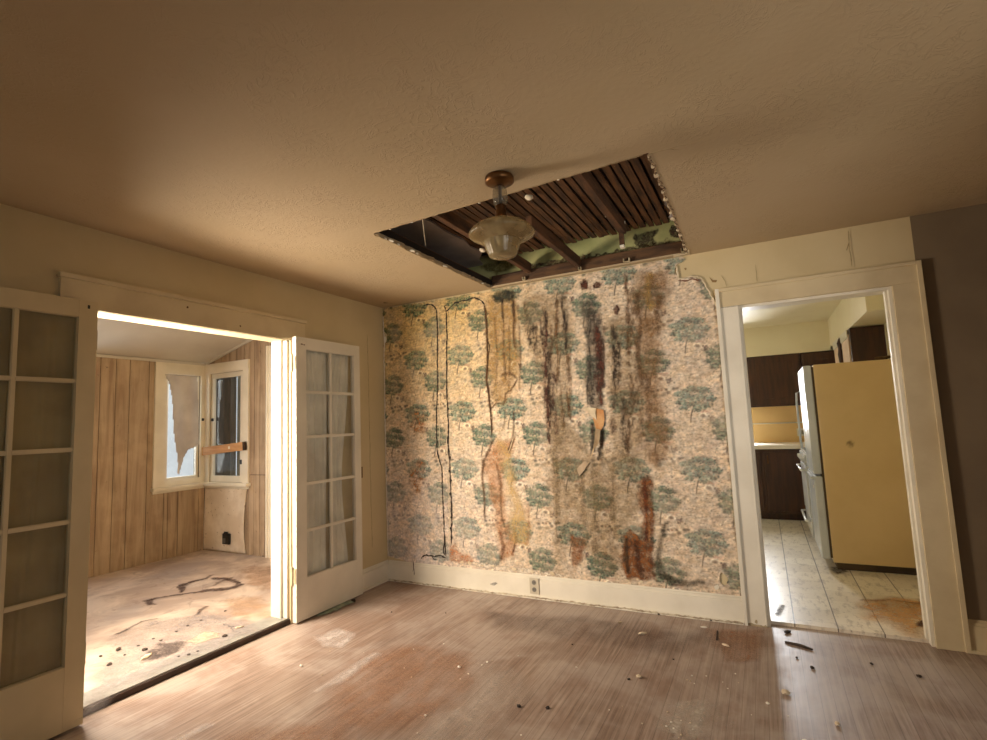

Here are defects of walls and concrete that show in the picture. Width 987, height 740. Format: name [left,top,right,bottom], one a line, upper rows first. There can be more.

spalling [374,154,690,288]
damp [481,290,518,516]
damp [529,296,571,444]
damp [583,274,667,460]
damp [657,553,704,585]